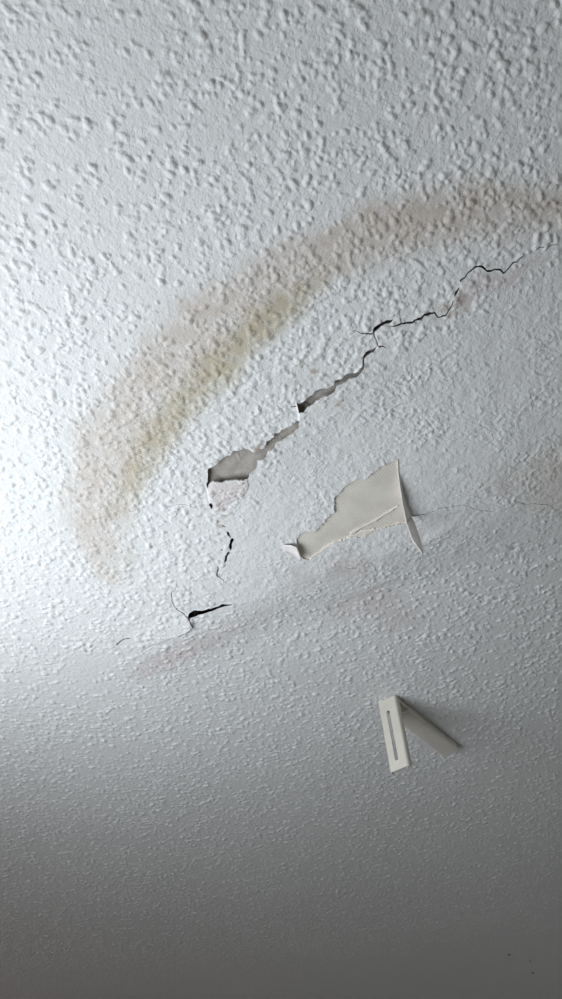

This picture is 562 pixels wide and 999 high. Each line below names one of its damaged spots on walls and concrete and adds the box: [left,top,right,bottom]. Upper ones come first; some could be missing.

crack [292,244,557,413]
crack [116,503,234,657]
spalling [206,402,310,512]
peeling [283,459,423,560]